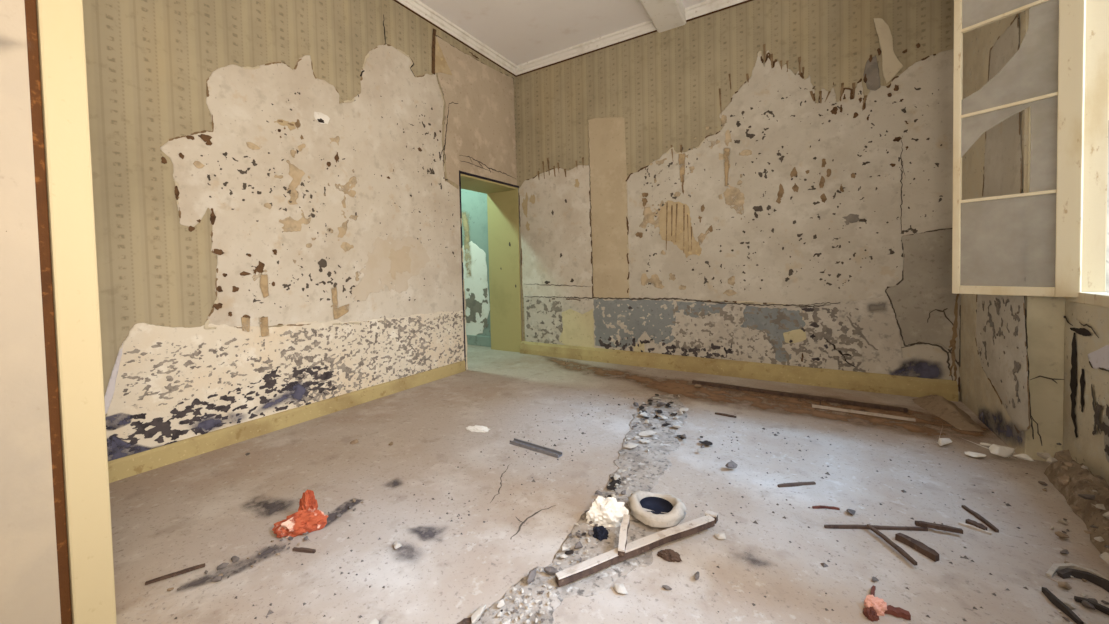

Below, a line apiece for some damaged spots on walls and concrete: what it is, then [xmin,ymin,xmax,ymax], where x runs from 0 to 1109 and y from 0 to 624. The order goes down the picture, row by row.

peeling [830,48,909,124]
spalling [185,134,212,146]
spalling [274,119,304,140]
spalling [753,150,831,218]
spalling [659,177,713,284]
crack [525,123,961,381]
peeling [975,14,1031,434]
peeling [104,241,490,459]
peeling [515,273,904,376]
leakage [891,360,942,379]
peeling [1064,316,1109,372]
spalling [1092,398,1109,462]